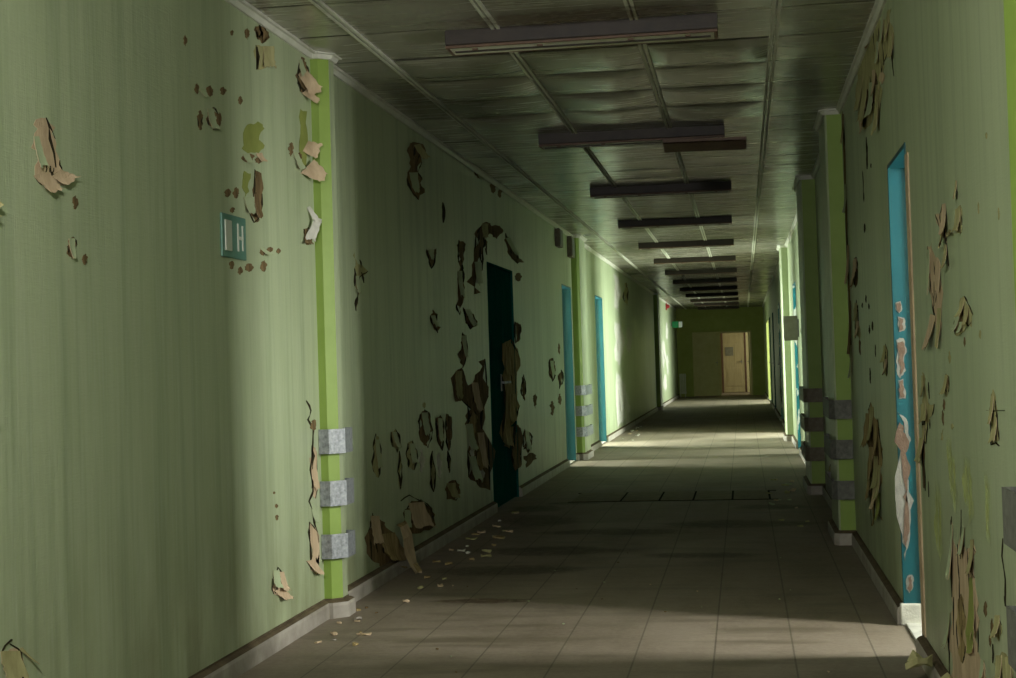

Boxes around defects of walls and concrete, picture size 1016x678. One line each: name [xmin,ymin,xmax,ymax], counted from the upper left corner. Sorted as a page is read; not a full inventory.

peeling [230,25,277,70]
peeling [31,118,81,193]
peeling [224,122,267,223]
peeling [288,57,327,182]
peeling [303,206,322,245]
peeling [840,9,894,393]
peeling [451,222,537,490]
peeling [869,301,907,399]
peeling [894,180,981,557]
peeling [306,400,324,575]
peeling [371,402,460,534]
peeling [941,516,1014,678]